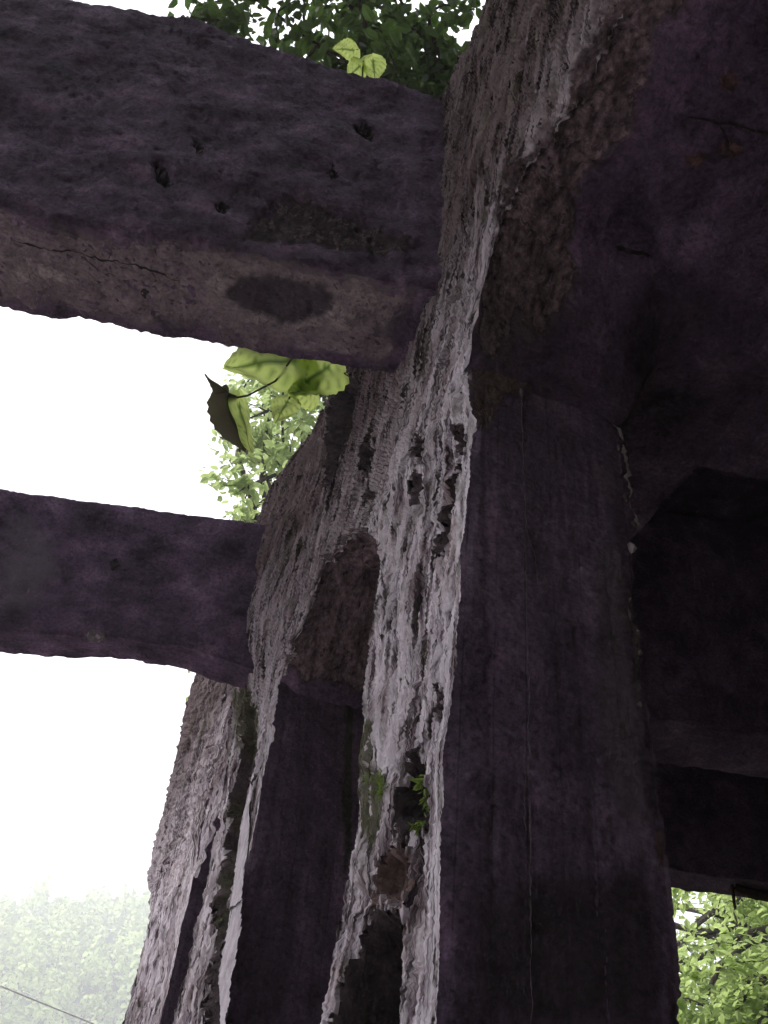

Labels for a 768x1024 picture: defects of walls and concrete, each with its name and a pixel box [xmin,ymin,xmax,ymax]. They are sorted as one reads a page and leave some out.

crack [12,240,180,281]
leakage [0,209,413,361]
spalling [322,741,431,1024]